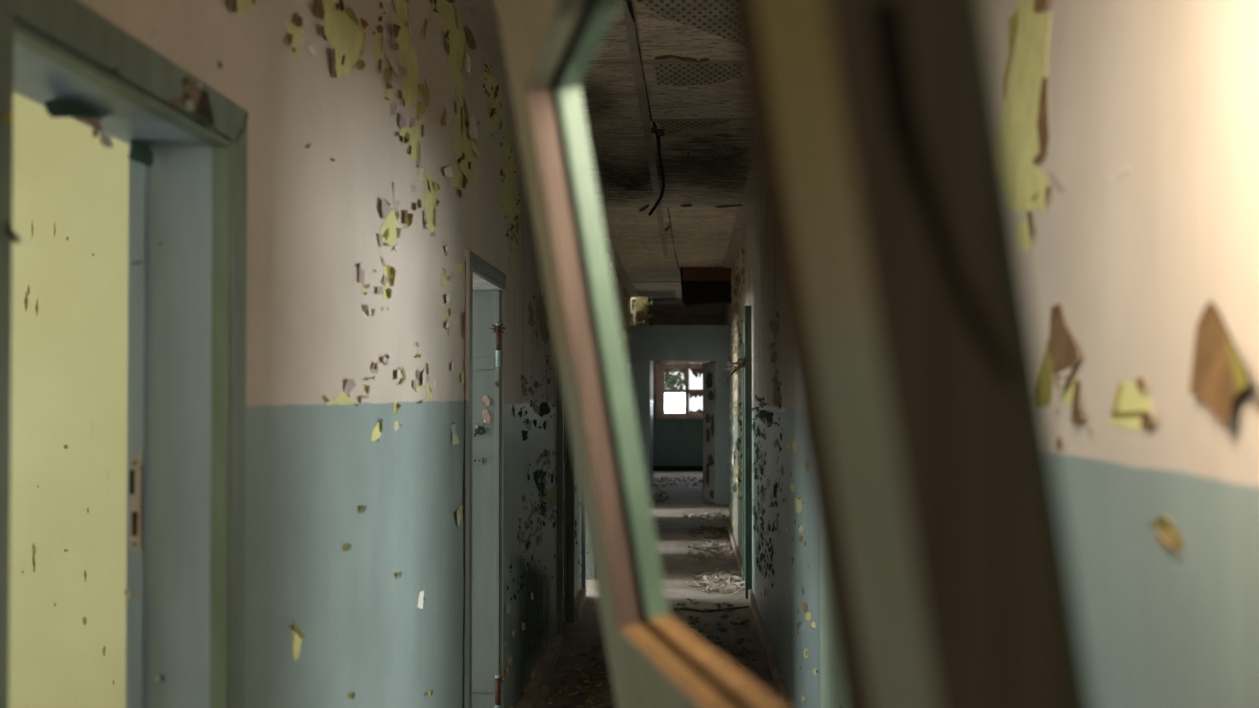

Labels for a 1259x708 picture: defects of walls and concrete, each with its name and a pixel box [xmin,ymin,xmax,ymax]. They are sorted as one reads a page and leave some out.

peeling [284,0,503,338]
peeling [999,0,1064,252]
peeling [323,342,436,406]
peeling [371,401,402,442]
peeling [703,247,809,597]
peeling [1039,303,1094,438]
peeling [1108,376,1154,430]
peeling [1190,300,1250,429]
peeling [506,449,558,614]
peeling [292,619,306,660]
peeling [417,591,426,609]
peeling [797,587,818,677]